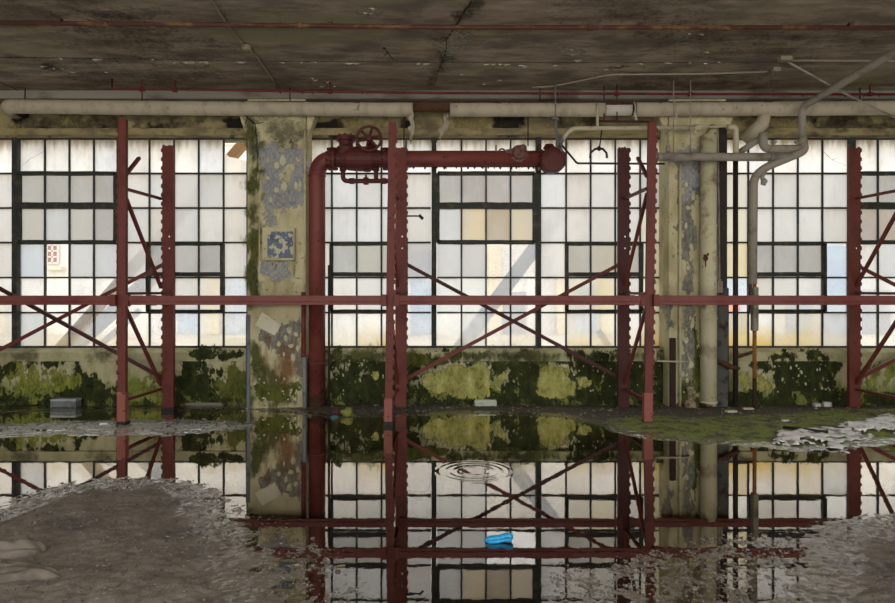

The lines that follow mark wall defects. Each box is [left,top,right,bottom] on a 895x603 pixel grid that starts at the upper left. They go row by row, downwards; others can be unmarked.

crack [0,55,115,63]
crack [143,57,246,65]
crack [279,47,396,65]
crack [417,1,768,85]
peeling [254,141,310,227]
peeling [660,182,700,394]
leakage [0,350,118,406]
leakage [175,344,244,405]
peeling [254,317,308,403]
leakage [325,345,395,405]
leakage [407,345,617,405]
leakage [729,348,847,405]